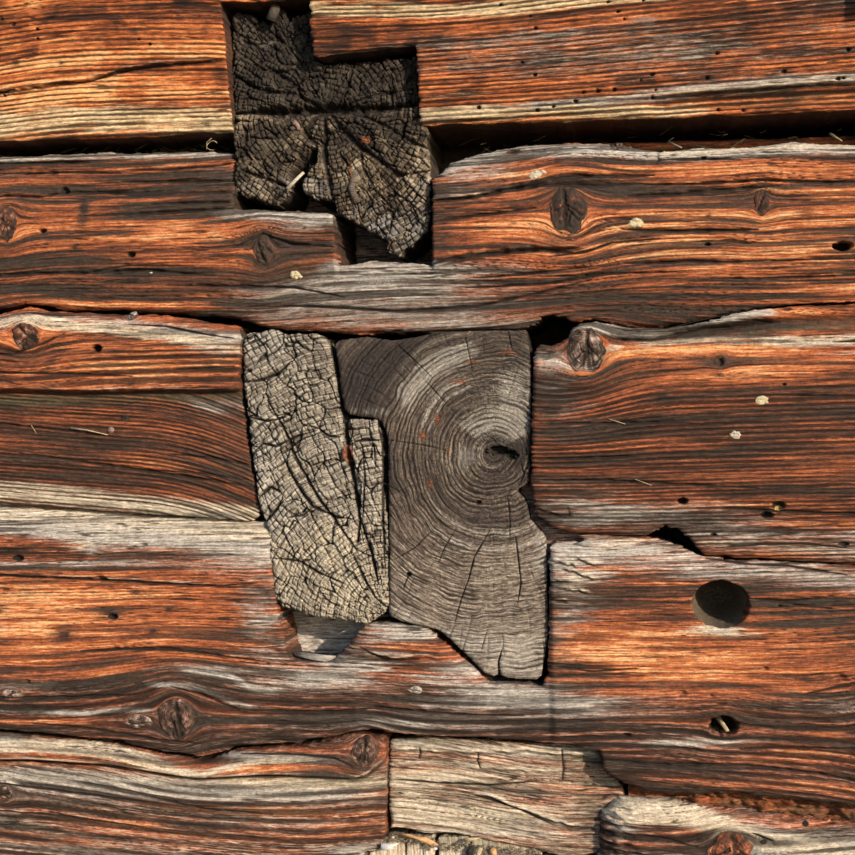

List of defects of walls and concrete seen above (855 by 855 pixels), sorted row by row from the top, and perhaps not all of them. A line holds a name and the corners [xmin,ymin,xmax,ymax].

crack [236,25,430,234]
crack [244,337,456,606]